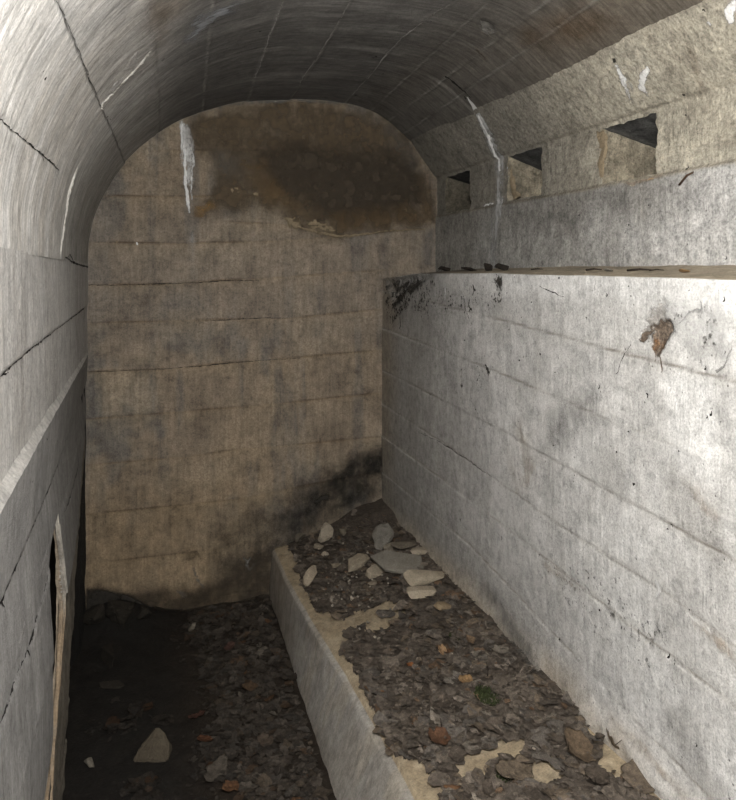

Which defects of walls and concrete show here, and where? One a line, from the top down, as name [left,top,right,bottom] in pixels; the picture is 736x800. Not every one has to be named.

leakage [615,65,630,98]
leakage [638,66,650,96]
crack [0,119,59,170]
leakage [180,99,434,238]
leakage [467,97,504,240]
crack [1,308,84,376]
leakage [276,449,383,547]